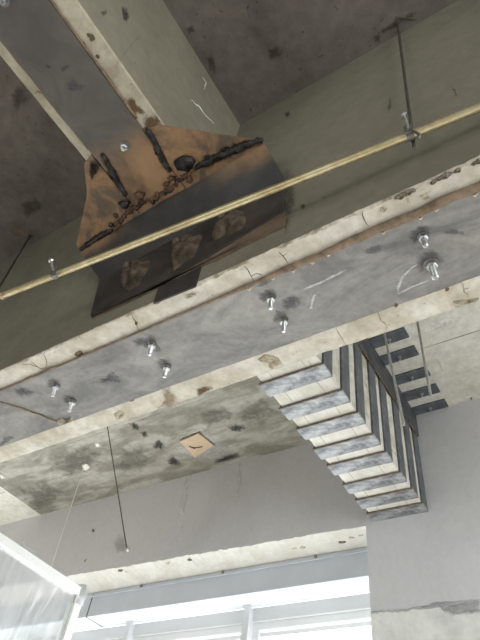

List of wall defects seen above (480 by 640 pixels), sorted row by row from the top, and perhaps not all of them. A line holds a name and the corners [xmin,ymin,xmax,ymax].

spalling [430,168,461,185]
spalling [394,188,430,200]
spalling [258,354,282,369]
flaking render [371,600,480,615]